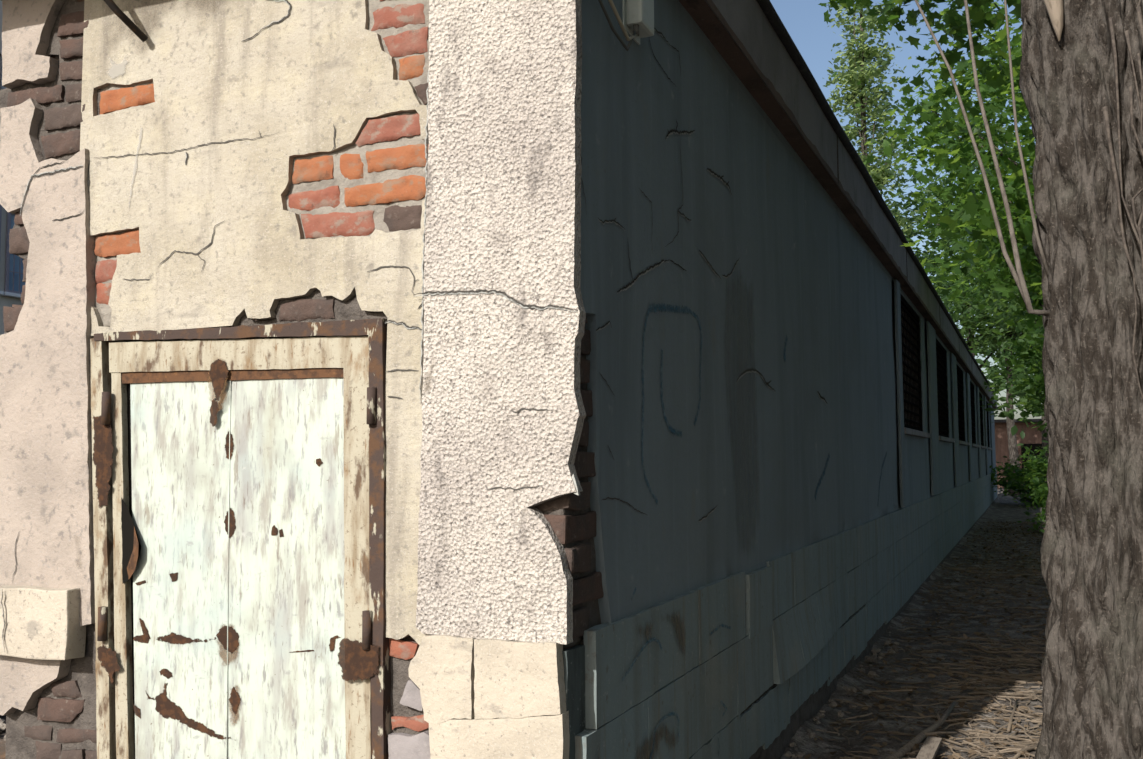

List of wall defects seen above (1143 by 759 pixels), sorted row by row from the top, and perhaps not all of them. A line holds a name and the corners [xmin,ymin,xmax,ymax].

crack [243,0,291,41]
spalling [0,0,155,161]
spalling [286,0,430,239]
crack [20,132,276,221]
crack [125,220,225,281]
crack [367,56,577,399]
spalling [237,289,387,326]
spalling [535,318,604,648]
rust [224,508,236,538]
rust [133,618,239,664]
rust [329,635,379,683]
rust [133,669,236,741]